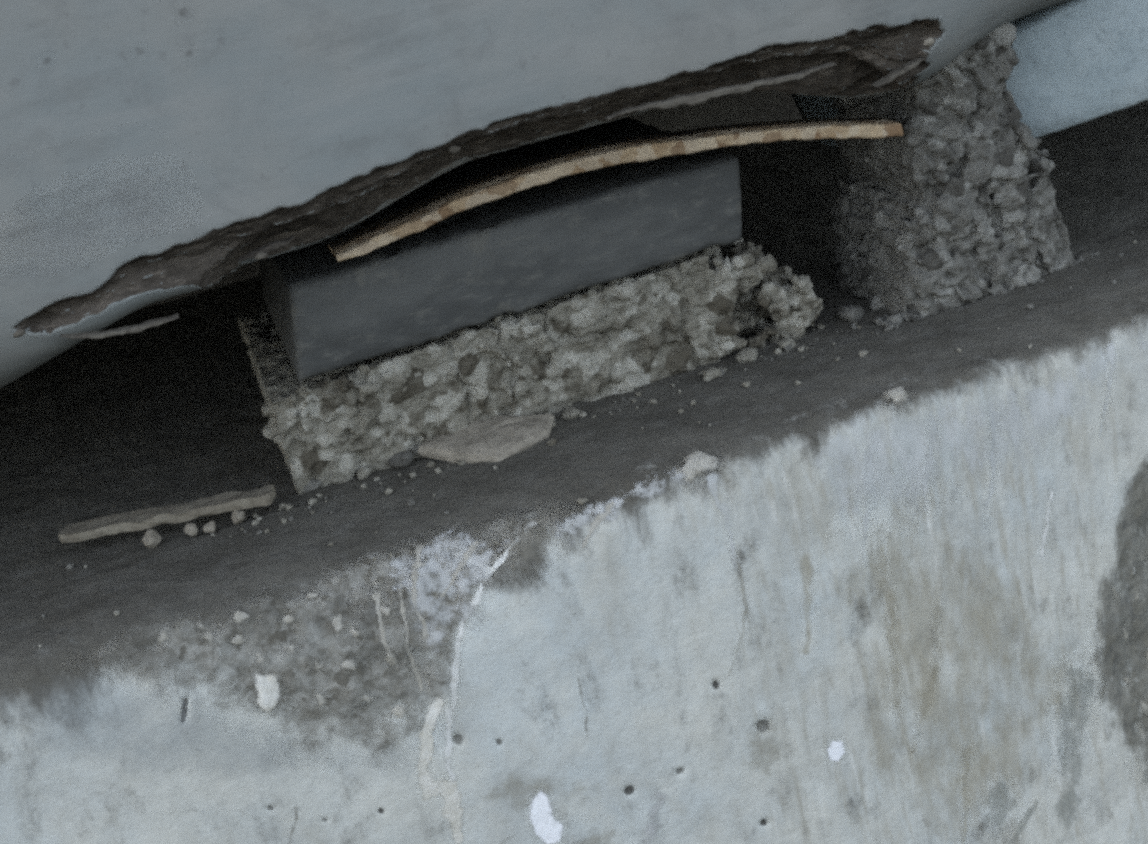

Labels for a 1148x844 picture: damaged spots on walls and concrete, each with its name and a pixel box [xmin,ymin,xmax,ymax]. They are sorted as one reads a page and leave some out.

spalling [13,19,943,339]
spalling [133,516,539,749]